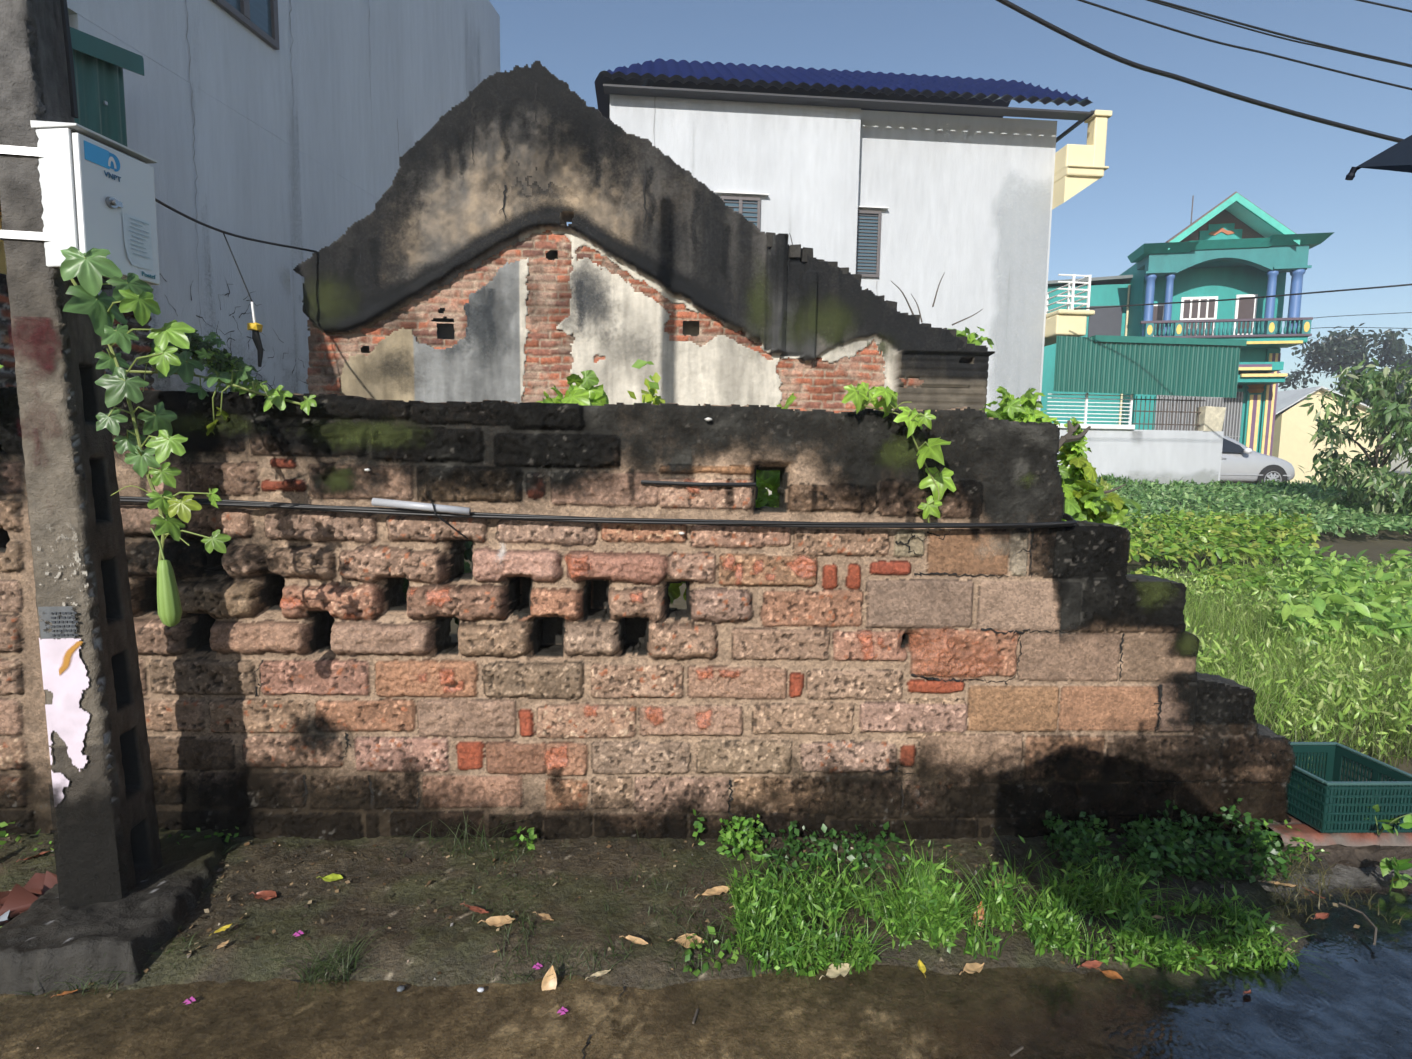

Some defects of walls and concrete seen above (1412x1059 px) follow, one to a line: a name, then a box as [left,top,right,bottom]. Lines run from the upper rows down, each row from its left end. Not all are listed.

peeling [306,230,924,413]
leakage [0,386,39,502]
leakage [109,61,1296,841]
leakage [0,763,122,906]